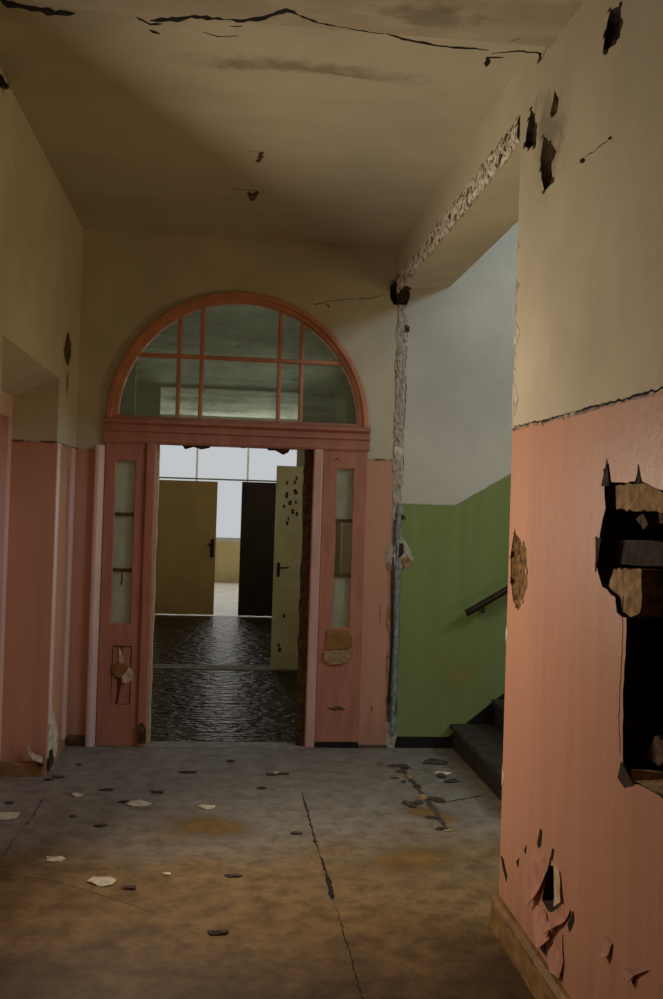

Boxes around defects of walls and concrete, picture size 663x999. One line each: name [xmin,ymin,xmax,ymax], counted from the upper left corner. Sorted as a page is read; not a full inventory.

crack [0,0,75,16]
crack [136,8,542,67]
spalling [603,2,623,55]
spalling [551,92,559,117]
flaking render [385,107,557,748]
crack [514,386,663,427]
spalling [601,459,663,618]
spalling [617,736,663,795]
crack [302,792,364,999]
peeling [500,829,575,979]